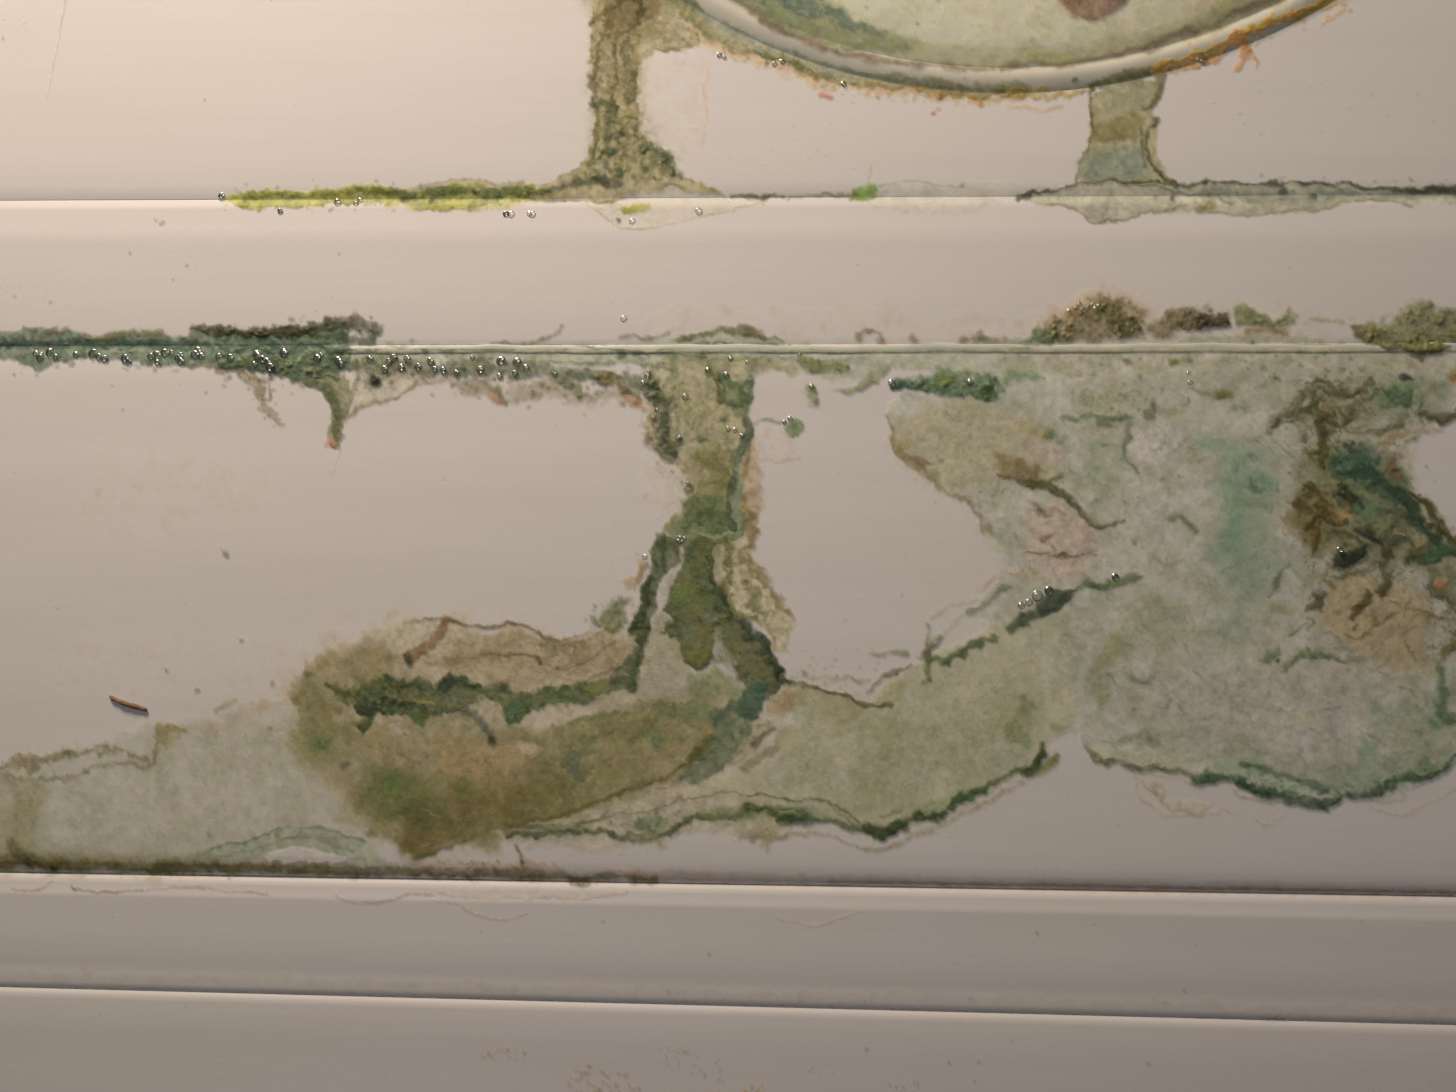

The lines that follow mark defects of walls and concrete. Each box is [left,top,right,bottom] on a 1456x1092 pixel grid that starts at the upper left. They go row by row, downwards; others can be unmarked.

water stain [1060,0,1125,19]
mould [349,373,415,416]
water stain [1074,392,1155,470]
water stain [1027,480,1116,529]
water stain [1328,442,1456,608]
water stain [629,575,652,630]
water stain [633,511,794,783]
water stain [904,575,1141,681]
water stain [1265,651,1338,663]
water stain [1436,644,1456,723]